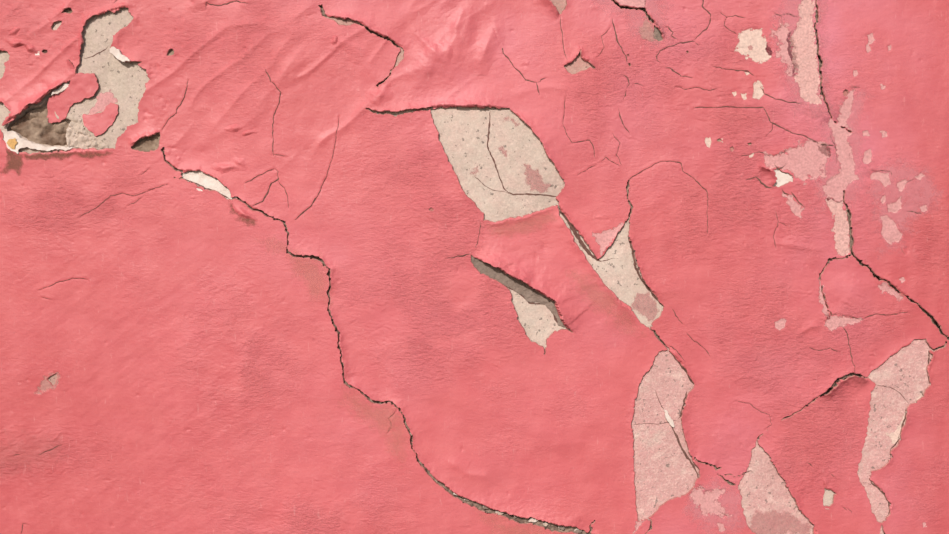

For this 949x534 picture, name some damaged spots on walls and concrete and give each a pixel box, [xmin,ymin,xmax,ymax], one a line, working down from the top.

peeling [0,7,150,155]
crack [80,82,188,217]
crack [318,4,402,87]
crack [229,70,595,534]
peeling [365,106,664,331]
peeling [471,255,573,355]
crack [563,0,852,234]
crack [738,190,949,445]
peeling [631,345,700,522]
crack [694,459,744,515]
peeling [738,439,814,534]
peeling [857,339,933,534]